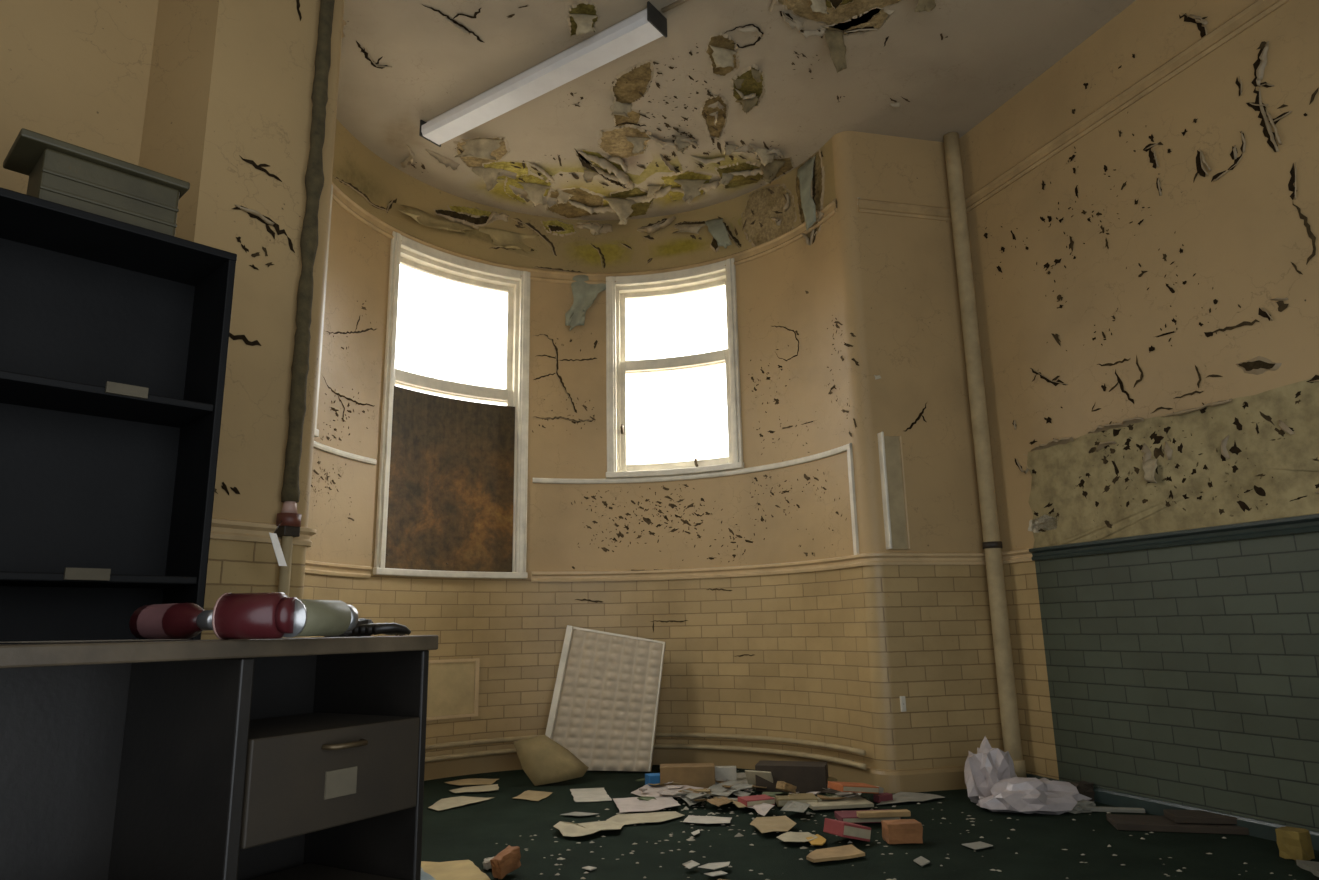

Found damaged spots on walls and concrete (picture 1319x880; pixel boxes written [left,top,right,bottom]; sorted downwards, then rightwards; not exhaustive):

peeling [567,1,600,37]
peeling [769,0,936,79]
peeling [333,24,837,330]
crack [325,316,376,334]
crack [532,332,599,435]
peeling [571,469,847,562]